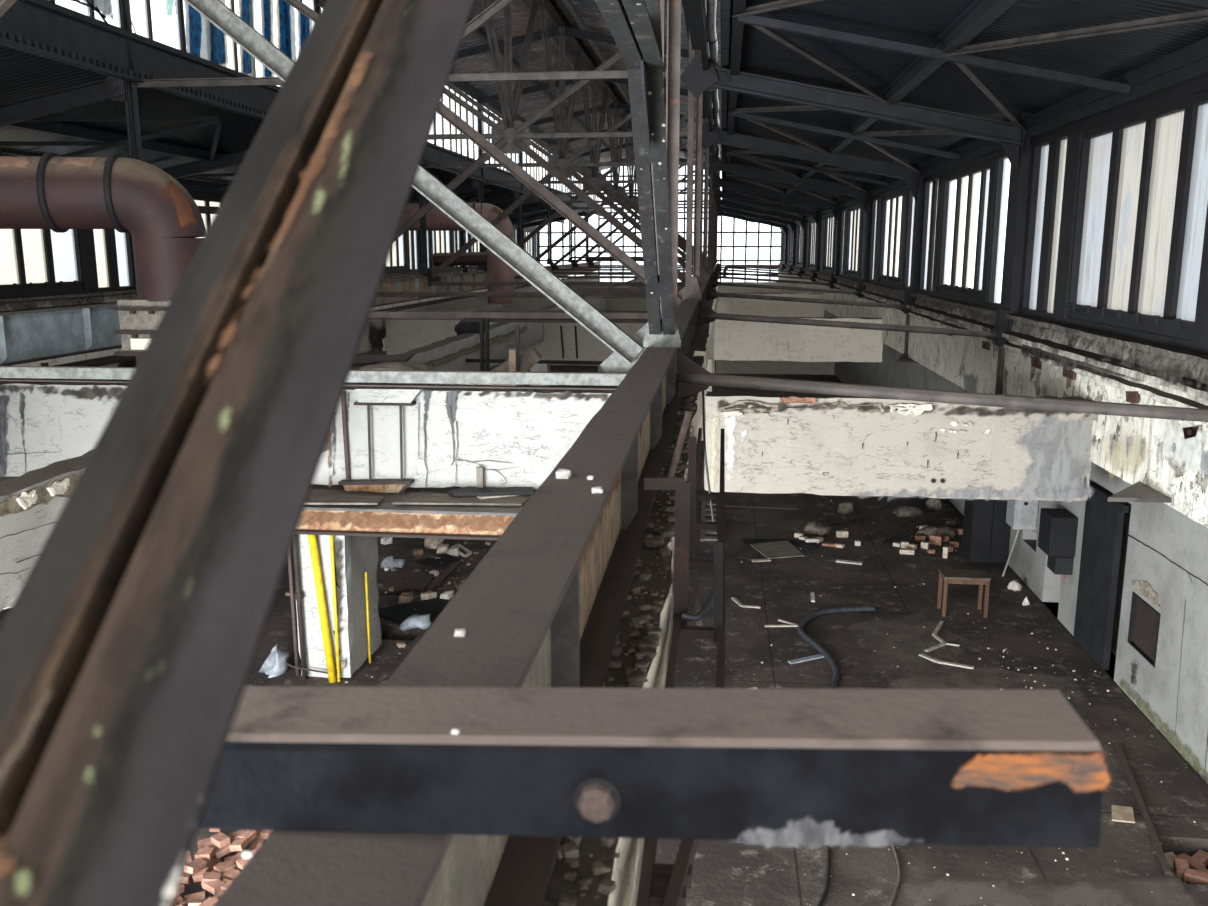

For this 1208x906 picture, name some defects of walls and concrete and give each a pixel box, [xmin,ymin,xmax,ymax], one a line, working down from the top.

corrosion [349,52,372,88]
corrosion [273,104,348,247]
corrosion [164,181,197,227]
corrosion [208,322,235,374]
leakage [0,385,124,477]
corrosion [300,511,515,532]